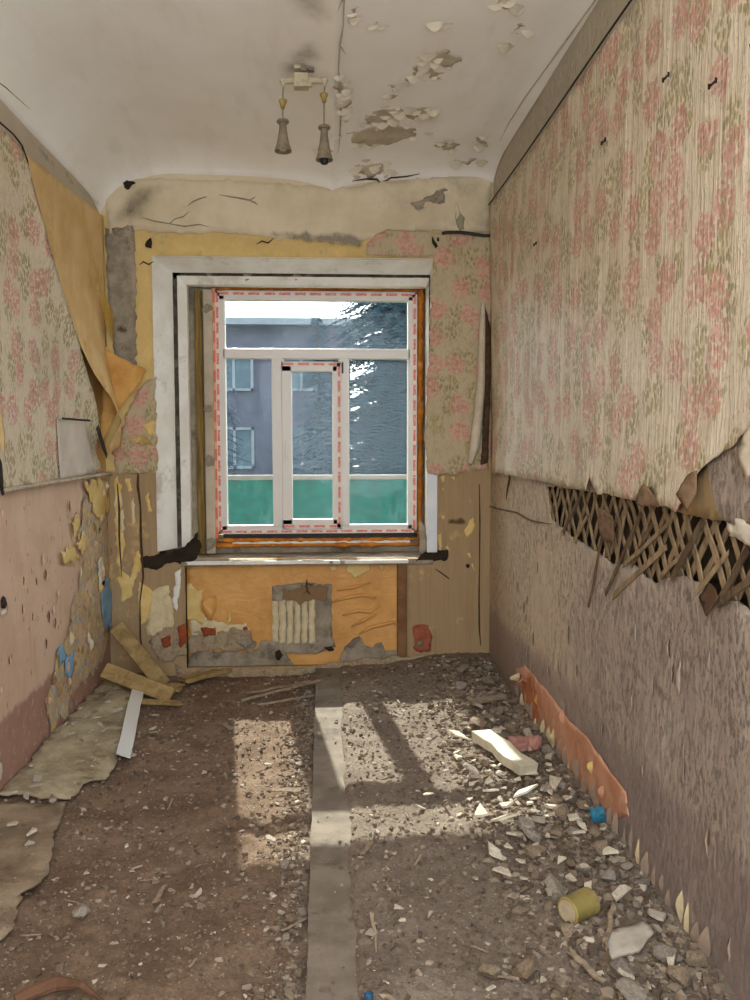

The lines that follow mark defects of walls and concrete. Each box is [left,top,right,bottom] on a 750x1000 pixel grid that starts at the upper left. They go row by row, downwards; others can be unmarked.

crack [337,0,345,153]
peeling [331,49,489,180]
crack [142,194,258,227]
flaking render [411,188,465,231]
peeling [26,154,156,453]
spalling [0,596,8,616]
peeling [45,476,432,733]
spalling [552,486,623,564]
spalling [693,577,722,595]
peeling [447,665,710,958]